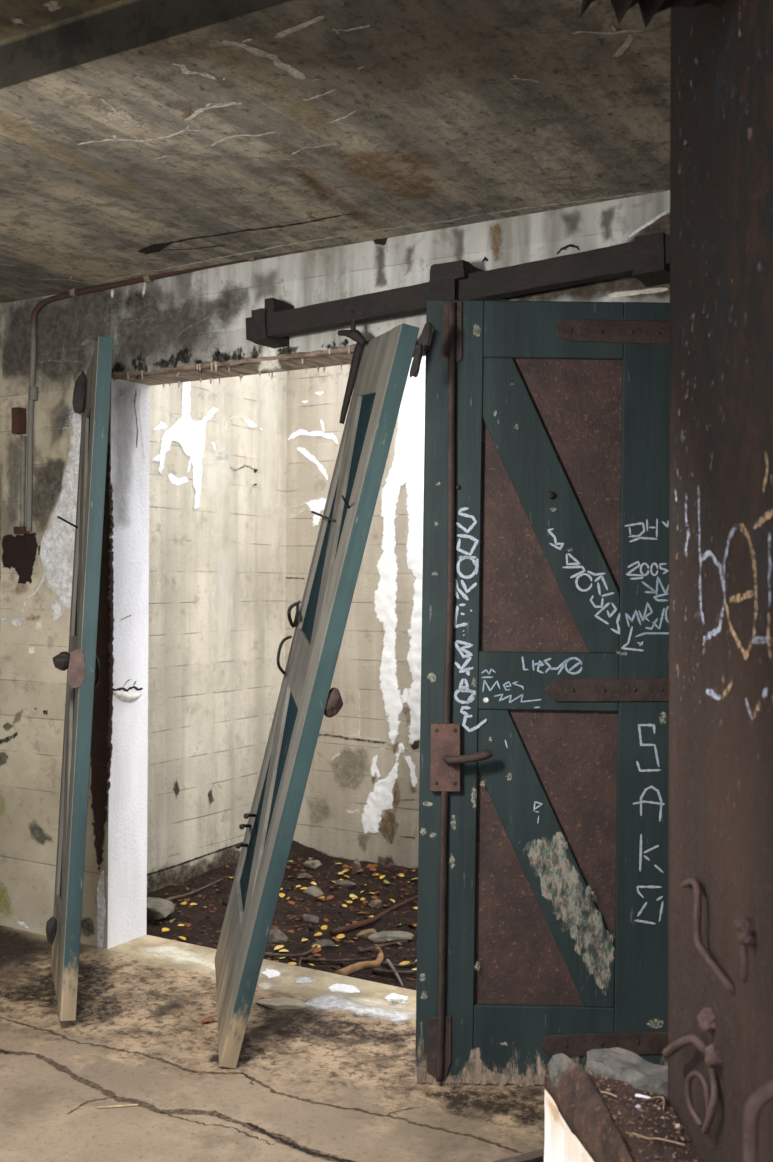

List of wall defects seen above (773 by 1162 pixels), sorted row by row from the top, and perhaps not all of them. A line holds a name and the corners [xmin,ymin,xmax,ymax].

water stain [3,190,670,526]
water stain [22,460,65,612]
water stain [216,546,233,654]
water stain [346,356,426,849]
crack [0,1017,523,1162]